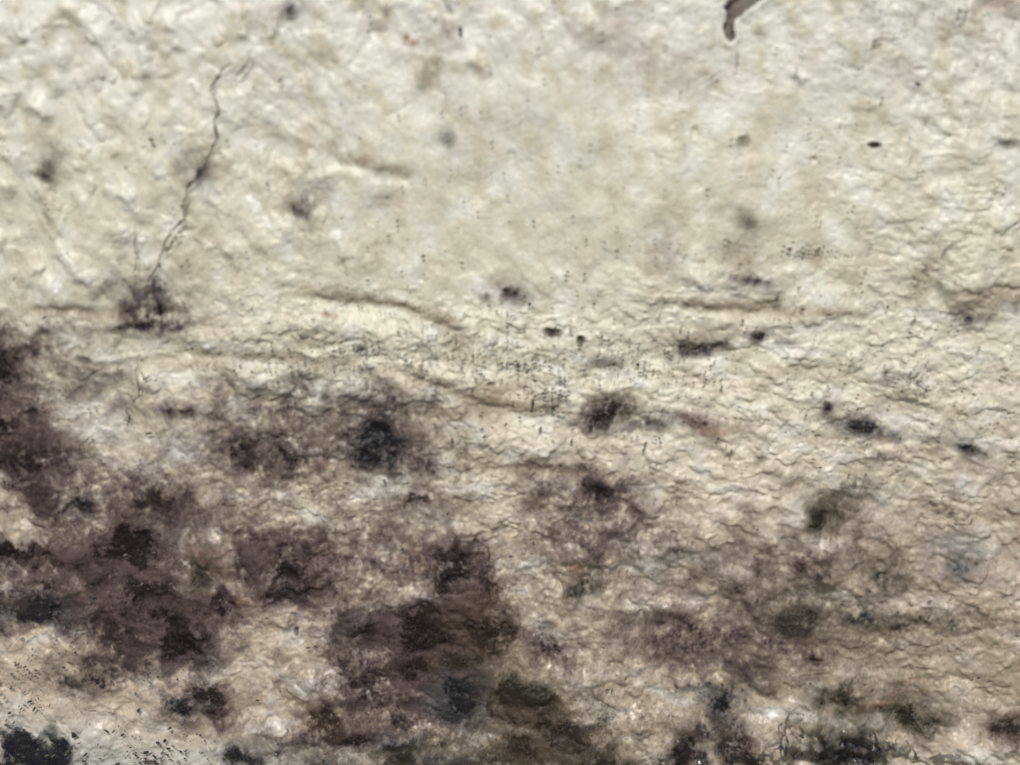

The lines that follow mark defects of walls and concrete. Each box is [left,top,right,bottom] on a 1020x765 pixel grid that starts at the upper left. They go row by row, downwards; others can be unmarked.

spalling [723,0,760,41]
crack [108,54,252,296]
leakage [687,262,779,311]
leakage [374,298,430,317]
leakage [677,336,731,357]
leakage [750,330,768,340]
leakage [568,395,666,434]
leakage [845,415,902,438]
leakage [957,440,980,457]
leakage [0,328,630,765]
leakage [806,476,907,592]
leakage [989,713,1020,751]